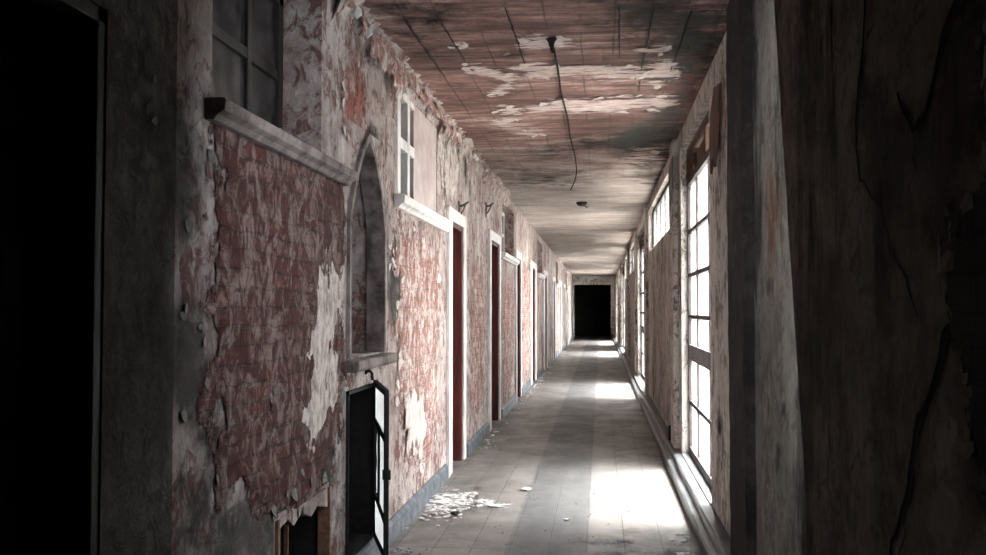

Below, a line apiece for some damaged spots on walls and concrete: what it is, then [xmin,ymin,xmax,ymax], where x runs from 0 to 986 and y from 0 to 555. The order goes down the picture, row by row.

peeling [461,33,681,139]
spalling [145,98,347,521]
spalling [388,213,441,480]
crack [889,323,952,555]